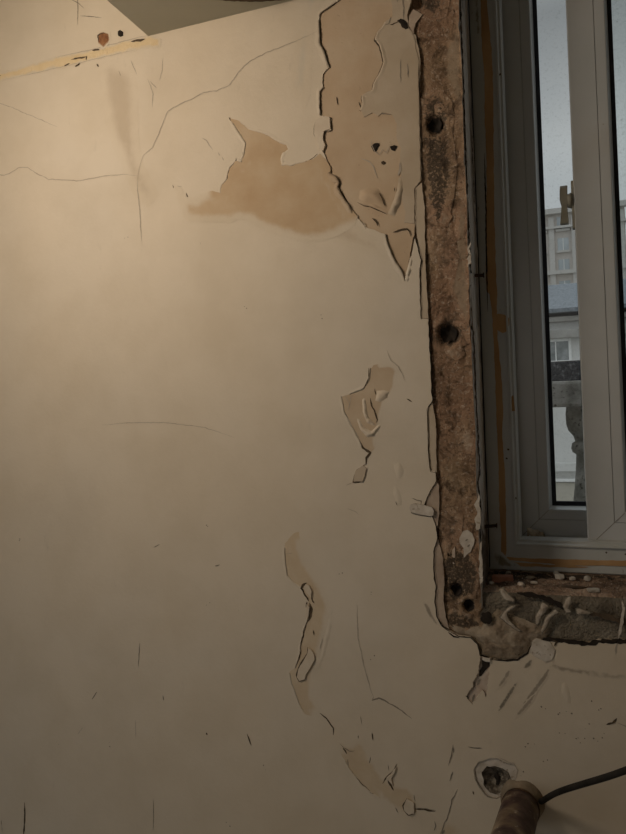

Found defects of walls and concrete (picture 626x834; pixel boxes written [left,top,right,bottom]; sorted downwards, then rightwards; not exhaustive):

leakage [173,117,358,242]
peeling [310,0,552,703]
peeling [282,532,435,823]